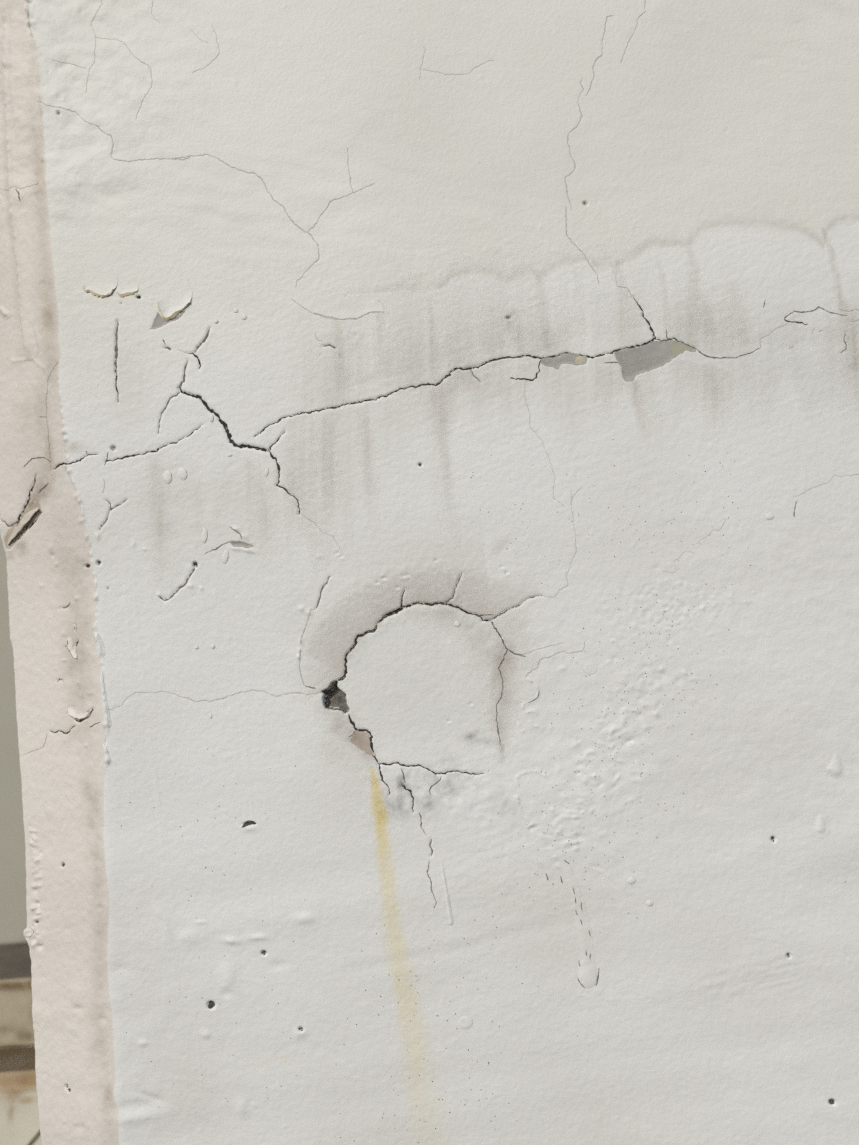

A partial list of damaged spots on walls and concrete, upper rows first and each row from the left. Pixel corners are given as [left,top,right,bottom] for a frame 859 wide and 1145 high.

peeling [83,265,141,299]
peeling [150,273,192,329]
crack [3,0,859,755]
spalling [541,353,587,369]
spalling [614,340,696,382]
spalling [4,500,41,549]
spalling [322,681,349,713]
crack [348,714,484,907]